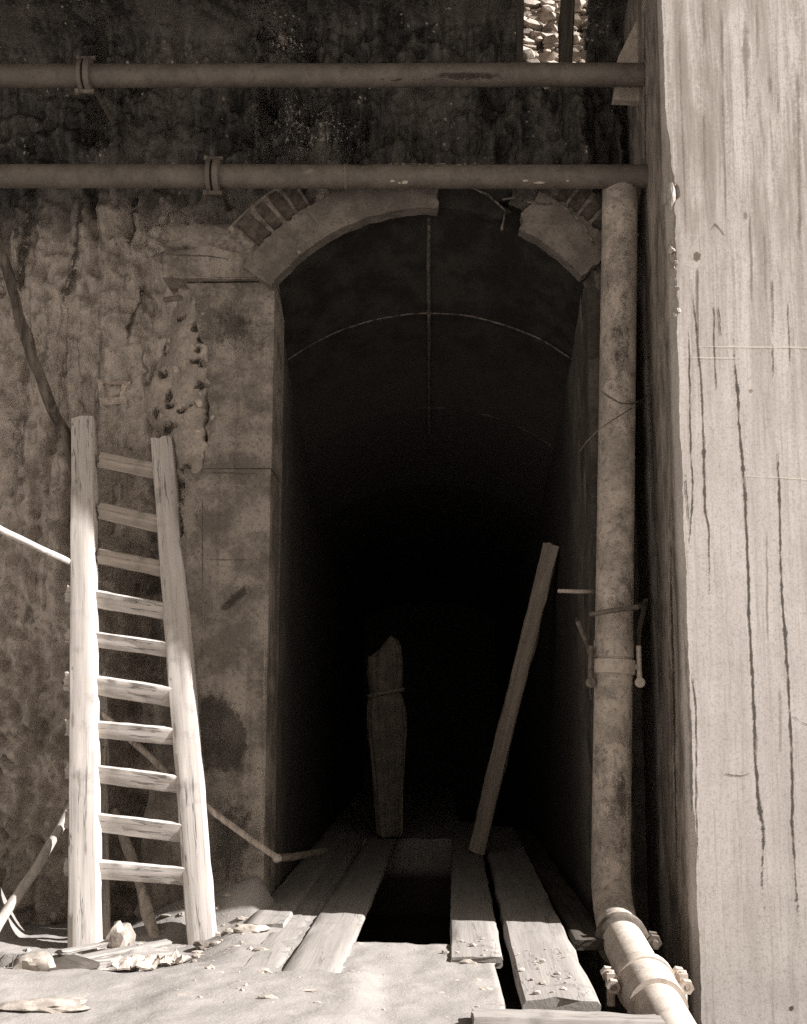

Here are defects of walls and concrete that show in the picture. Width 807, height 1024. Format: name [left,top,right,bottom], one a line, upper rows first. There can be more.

spalling [583,261,601,290]
spalling [144,282,215,484]
crack [683,299,765,886]